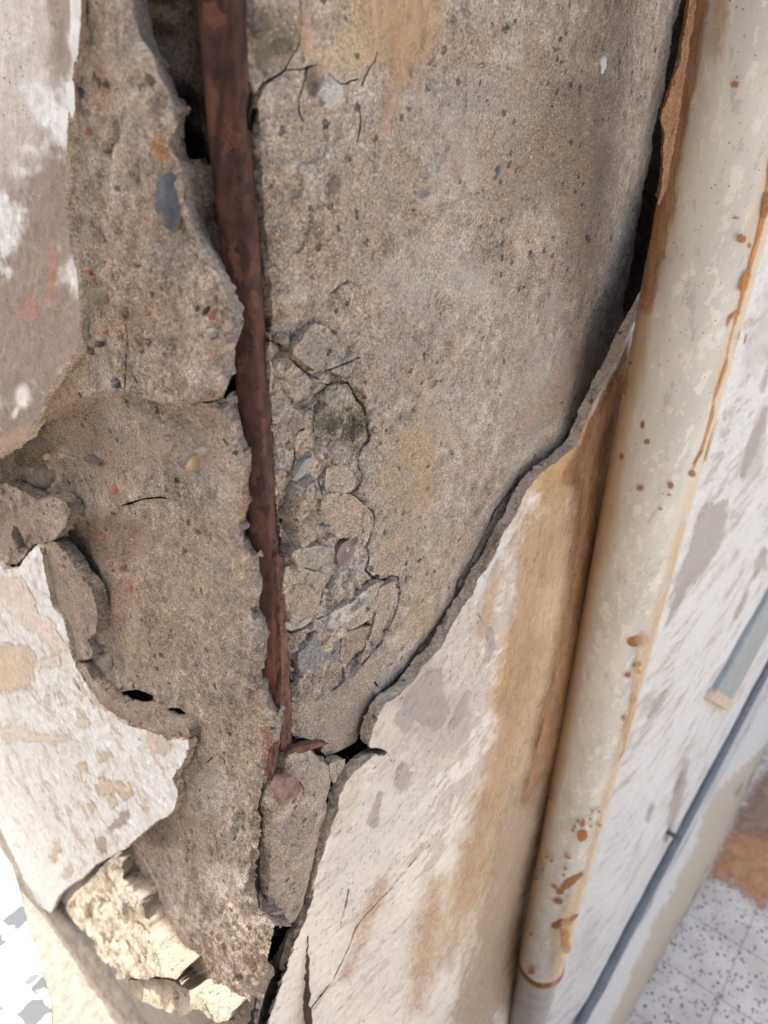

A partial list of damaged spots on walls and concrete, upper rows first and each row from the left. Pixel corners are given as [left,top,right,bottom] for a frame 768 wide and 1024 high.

crack [249,55,320,131]
corrosion [689,171,768,477]
spalling [0,0,303,1024]
crack [248,785,294,1024]
crack [324,739,385,803]
leakage [449,775,541,1024]
corrosion [506,346,632,988]
corrosion [627,636,642,647]
corrosion [712,774,768,908]